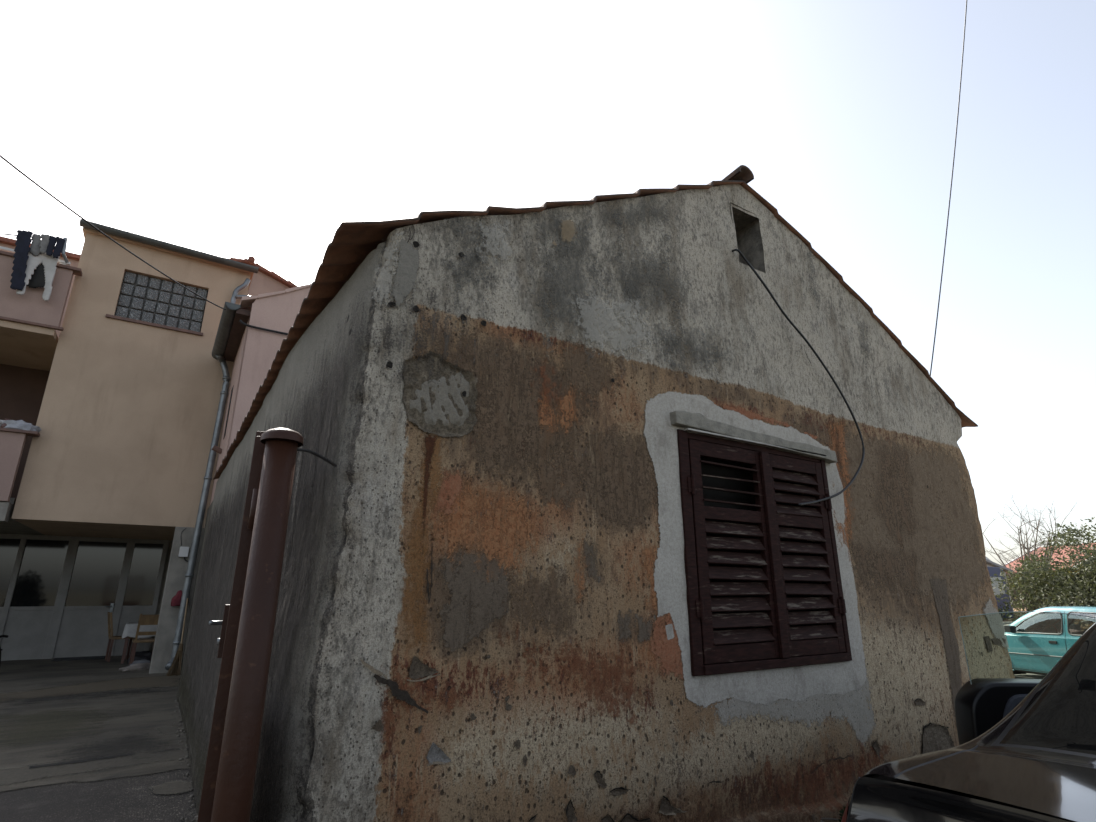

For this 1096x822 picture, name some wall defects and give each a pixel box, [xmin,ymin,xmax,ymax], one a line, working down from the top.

damp [524,196,735,419]
spalling [402,350,478,438]
damp [250,215,492,822]
damp [176,451,252,813]
spalling [360,655,440,734]
spalling [922,723,955,754]
spalling [594,770,630,796]
spalling [601,775,687,822]